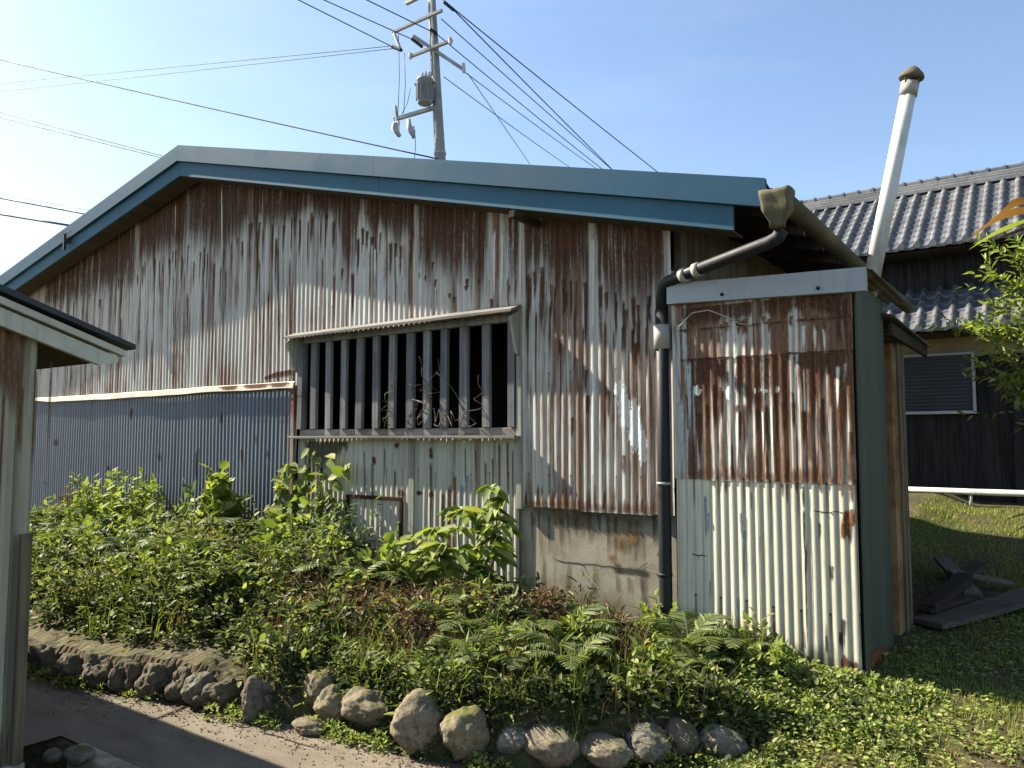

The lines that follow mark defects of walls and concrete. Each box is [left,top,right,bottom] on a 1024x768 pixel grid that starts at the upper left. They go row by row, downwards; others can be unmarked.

rust [0,327,52,493]
rust [45,182,488,390]
rust [363,443,658,540]
rust [507,214,663,454]
water stain [613,563,648,576]
rust [676,293,856,540]